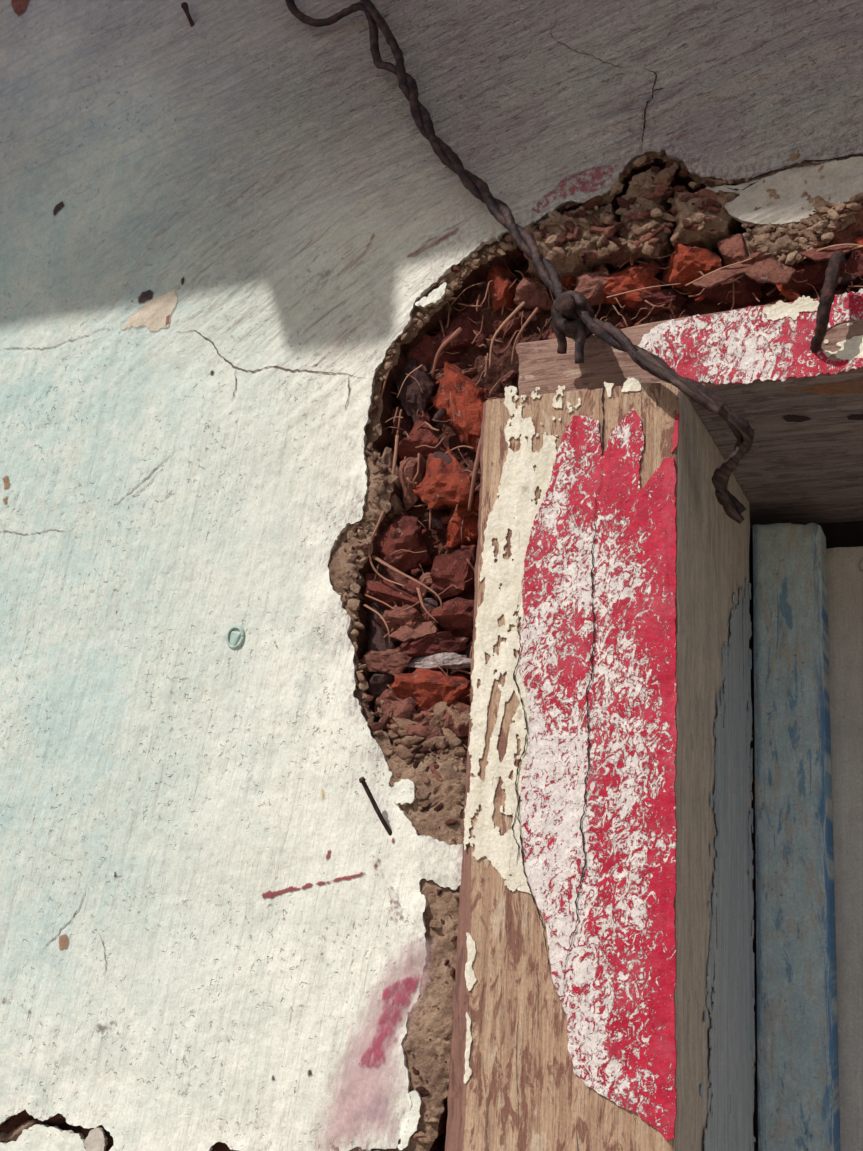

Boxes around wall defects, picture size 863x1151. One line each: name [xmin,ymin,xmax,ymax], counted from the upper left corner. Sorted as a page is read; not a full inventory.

crack [550,5,663,146]
crack [722,154,863,191]
peeling [121,277,184,332]
crack [1,328,110,350]
crack [176,297,363,408]
flaking render [322,150,863,845]
flaking render [331,879,460,1151]
flaking render [0,1109,117,1151]
flaking render [212,1142,238,1151]